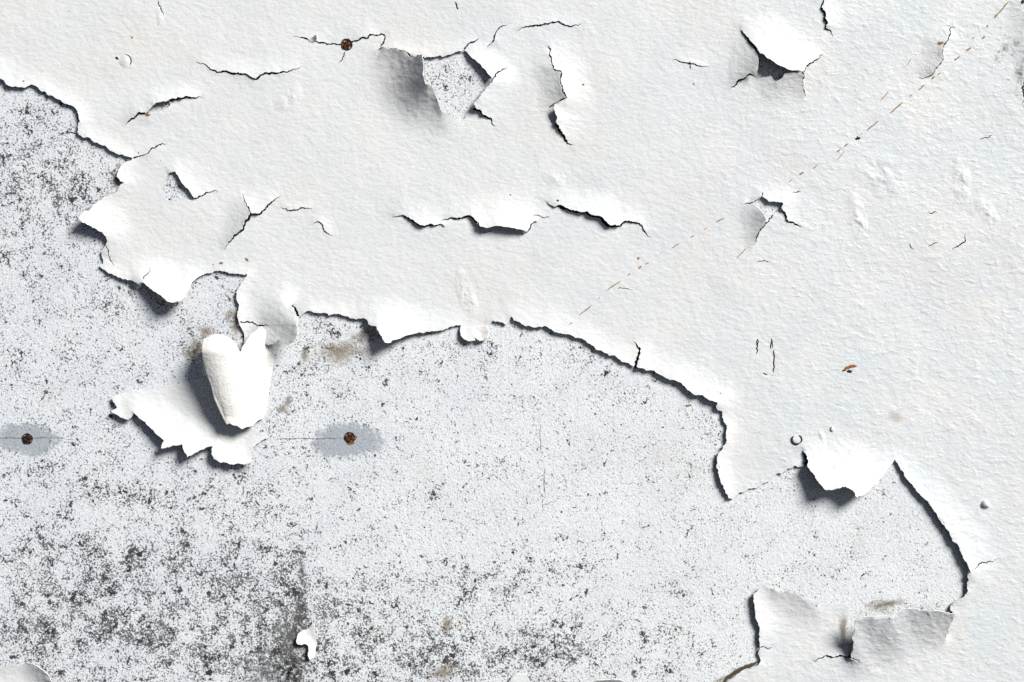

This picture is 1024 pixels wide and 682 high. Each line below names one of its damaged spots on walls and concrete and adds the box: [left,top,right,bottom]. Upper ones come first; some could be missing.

crack [119,26,386,164]
peeling [370,33,521,137]
crack [487,11,595,149]
peeling [0,51,260,339]
crack [216,189,334,250]
crack [388,186,654,237]
peeling [296,290,480,343]
peeling [111,326,277,465]
peeling [645,351,806,499]
peeling [794,435,894,498]
peeling [890,449,999,622]
peeling [727,585,849,682]